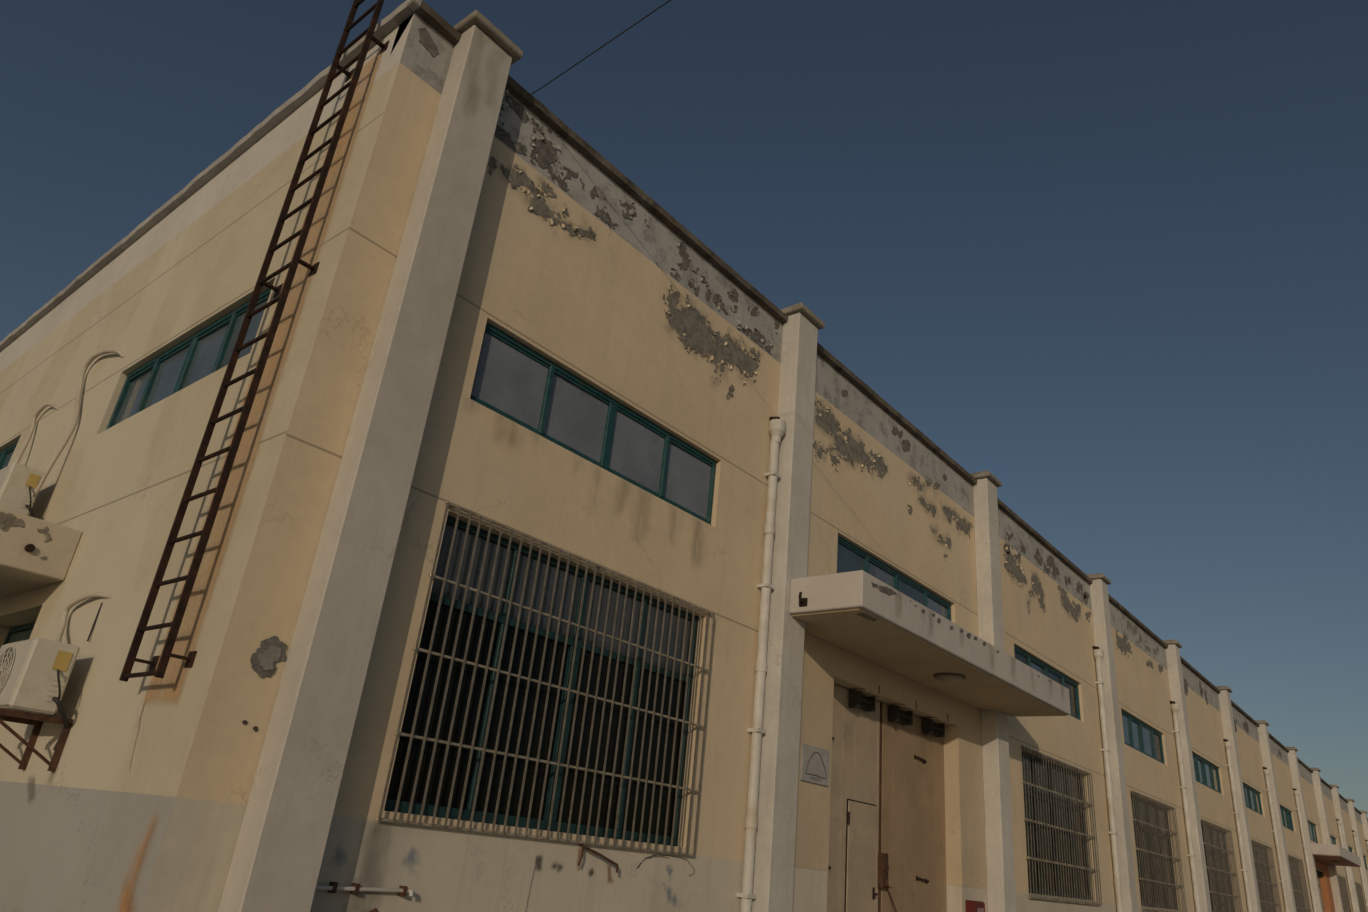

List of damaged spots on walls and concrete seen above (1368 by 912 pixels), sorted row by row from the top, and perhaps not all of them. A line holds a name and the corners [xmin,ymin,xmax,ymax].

peeling [488,89,652,241]
peeling [663,241,780,401]
peeling [813,398,888,479]
peeling [891,425,911,452]
spalling [0,512,52,560]
peeling [1003,532,1091,623]
peeling [250,636,287,678]